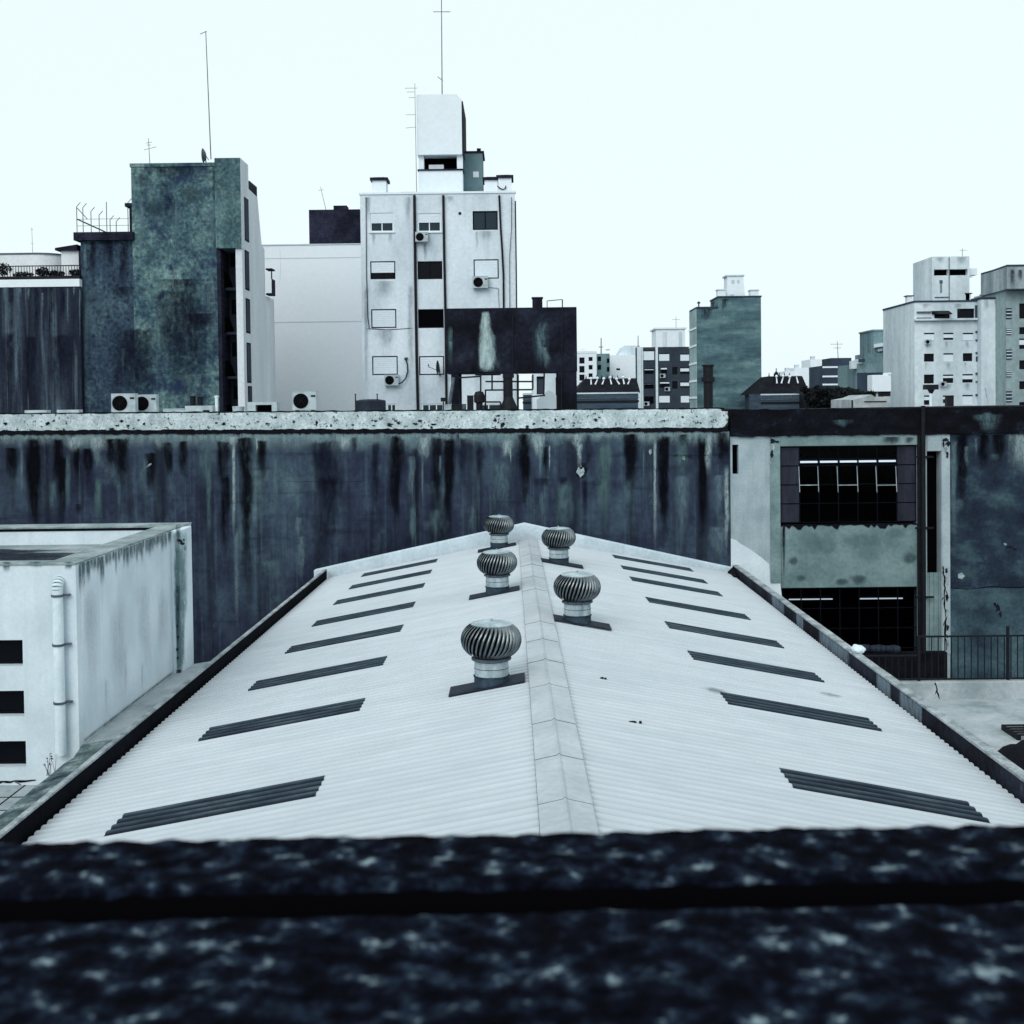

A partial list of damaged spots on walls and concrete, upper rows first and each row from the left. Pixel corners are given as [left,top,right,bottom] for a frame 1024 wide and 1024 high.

leakage [122,279,210,371]
leakage [0,431,729,587]
leakage [952,413,1024,494]
leakage [65,525,187,740]